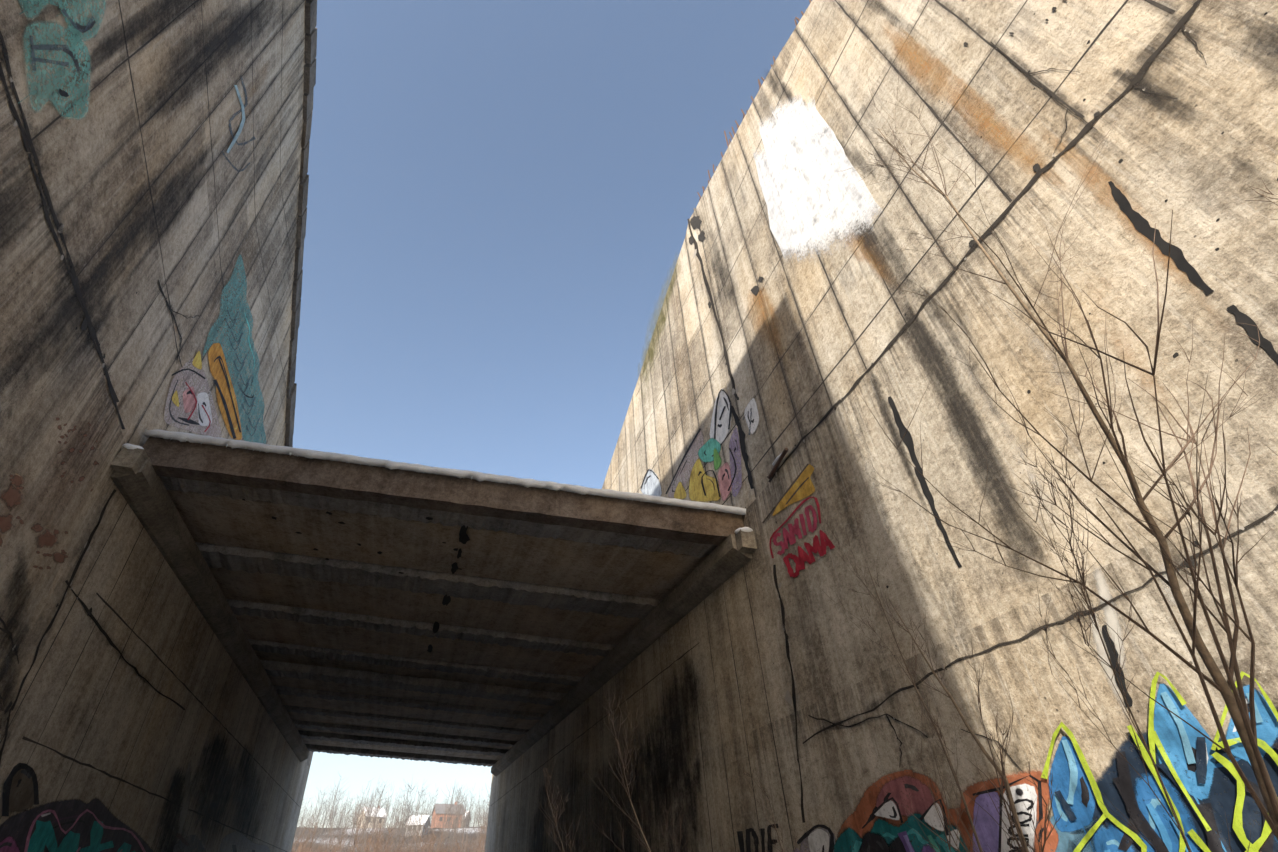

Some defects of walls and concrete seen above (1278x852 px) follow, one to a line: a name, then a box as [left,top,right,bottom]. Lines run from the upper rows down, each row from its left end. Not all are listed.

leakage [75,0,199,81]
leakage [146,0,273,112]
leakage [1114,70,1178,109]
crack [0,31,125,429]
leakage [5,144,214,383]
crack [687,219,739,400]
crack [768,0,1207,482]
leakage [0,561,29,728]
leakage [531,662,701,852]
crack [773,505,1278,823]